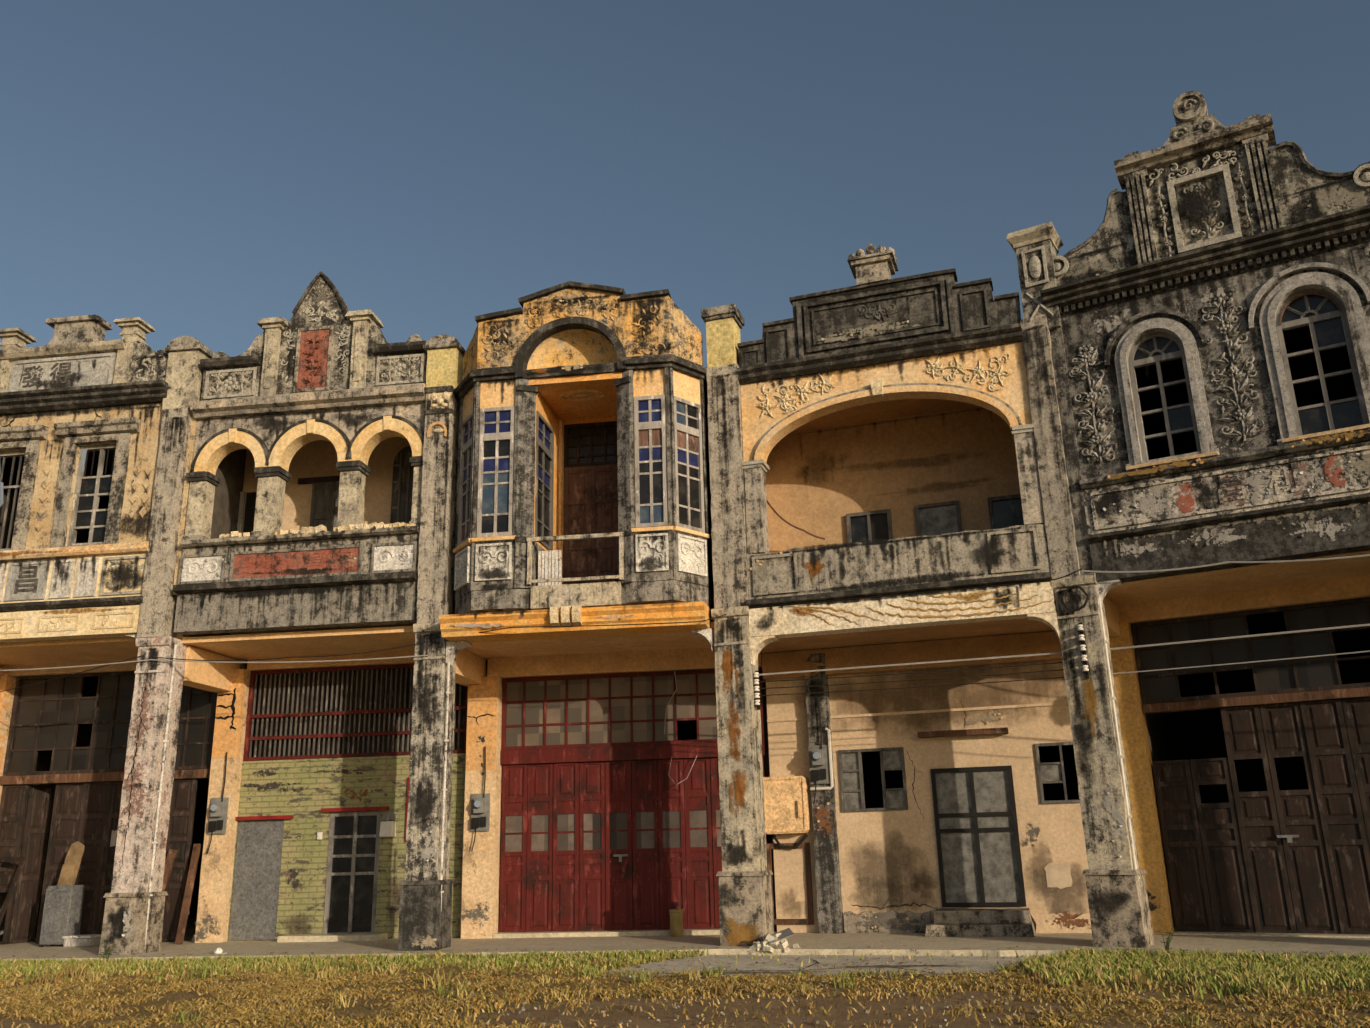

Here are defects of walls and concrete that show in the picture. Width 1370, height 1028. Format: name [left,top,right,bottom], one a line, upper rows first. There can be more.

damp [1101,241,1369,377]
damp [757,345,1005,393]
damp [1021,313,1083,495]
flaking render [1103,458,1212,518]
damp [1086,443,1370,558]
flaking render [1242,428,1370,507]
damp [139,648,159,691]
damp [412,634,441,733]
rust [722,650,746,812]
damp [720,526,1112,799]
damp [411,783,436,824]
damp [106,907,130,946]